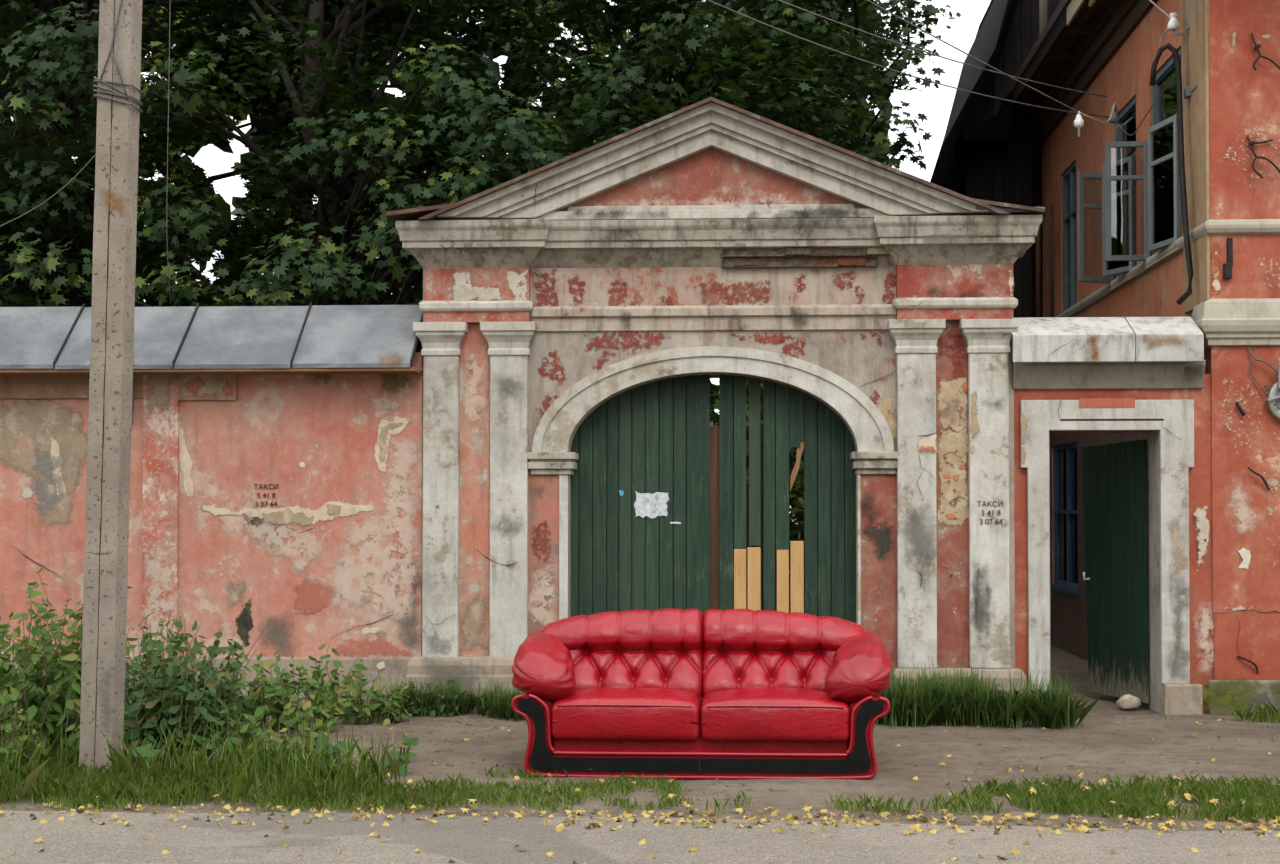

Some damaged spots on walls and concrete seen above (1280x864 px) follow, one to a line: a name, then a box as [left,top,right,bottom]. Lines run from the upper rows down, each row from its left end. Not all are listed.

peeling [607,278,673,306]
spalling [699,247,896,305]
peeling [584,331,671,370]
peeling [917,331,980,526]
peeling [144,374,420,670]
peeling [528,520,557,625]
peeling [1170,506,1210,574]
peeling [1195,604,1253,670]